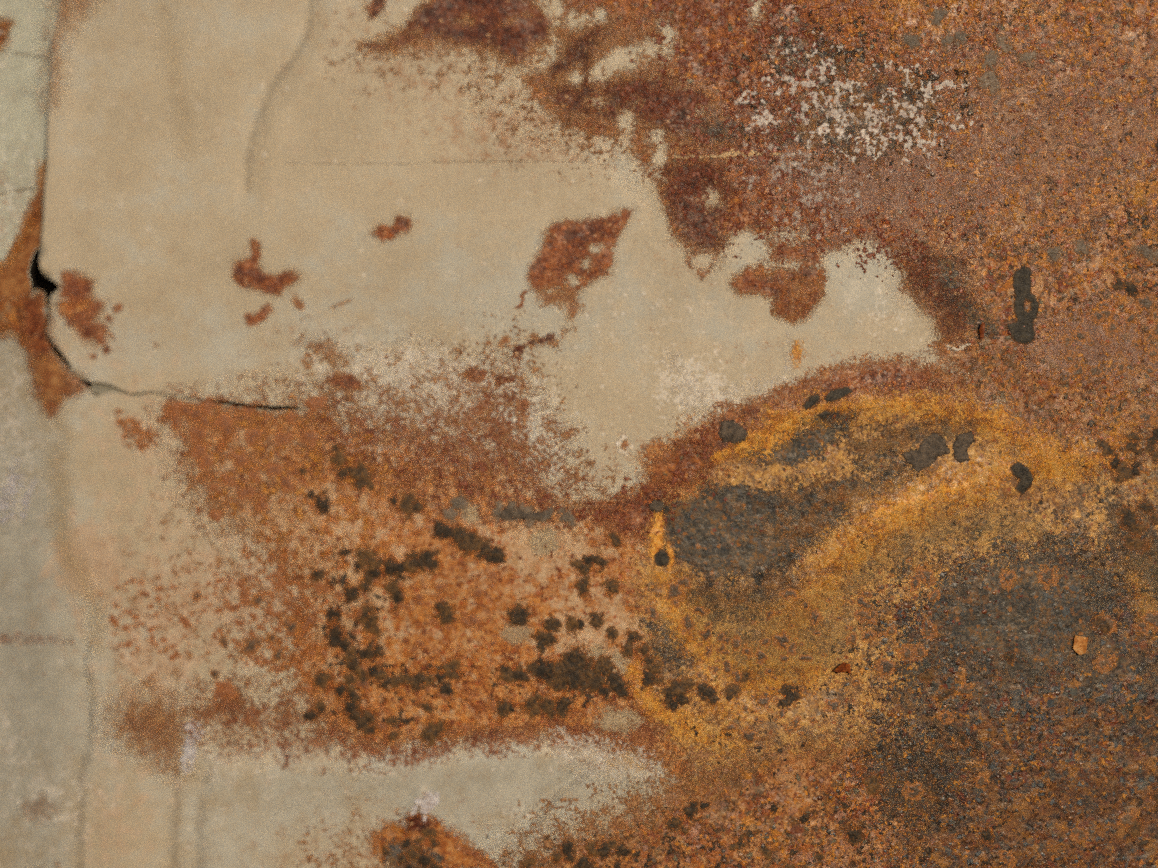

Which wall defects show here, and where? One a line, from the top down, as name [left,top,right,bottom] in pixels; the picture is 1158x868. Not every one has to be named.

rust [0,16,17,51]
rust [371,215,413,243]
rust [0,160,123,419]
rust [230,237,306,327]
rust [513,207,632,325]
rust [790,340,805,369]
crack [90,382,309,410]